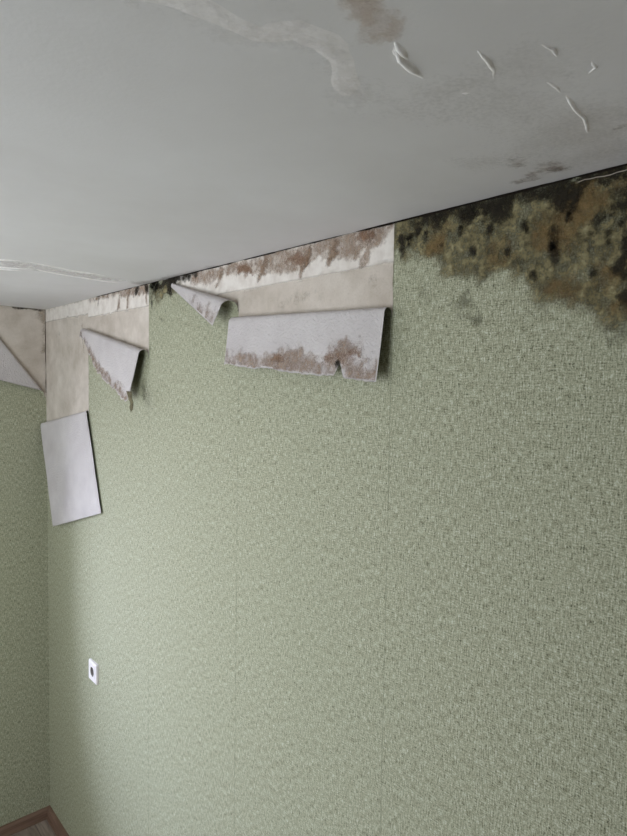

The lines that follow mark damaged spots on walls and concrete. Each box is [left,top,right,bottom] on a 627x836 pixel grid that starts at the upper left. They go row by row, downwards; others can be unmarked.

flaking render [0,259,149,421]
flaking render [175,223,395,317]
water stain [93,165,627,330]